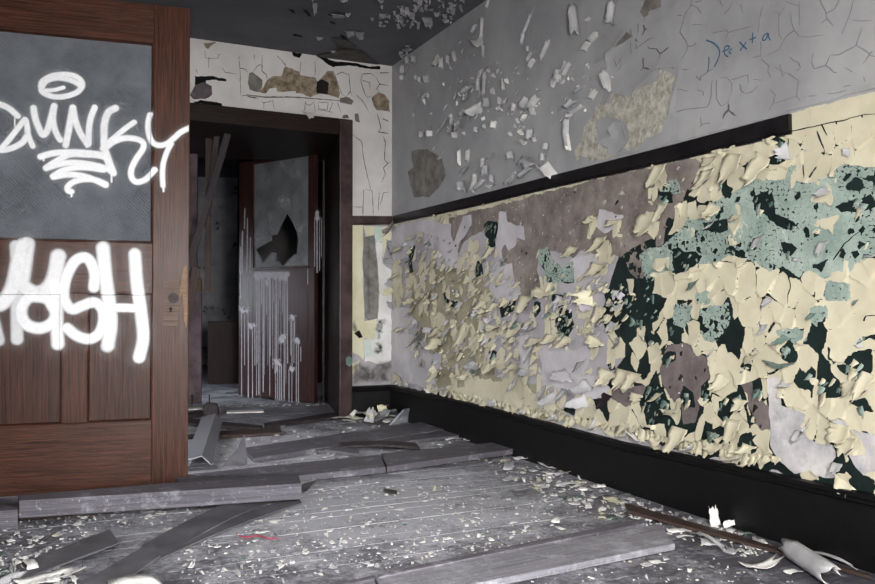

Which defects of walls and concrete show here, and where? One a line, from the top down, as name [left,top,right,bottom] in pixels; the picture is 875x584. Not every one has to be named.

crack [289,9,347,40]
flaking render [190,76,226,106]
flaking render [248,66,360,122]
crack [614,0,875,127]
crack [196,54,389,216]
crack [792,114,868,135]
peeling [344,0,875,494]